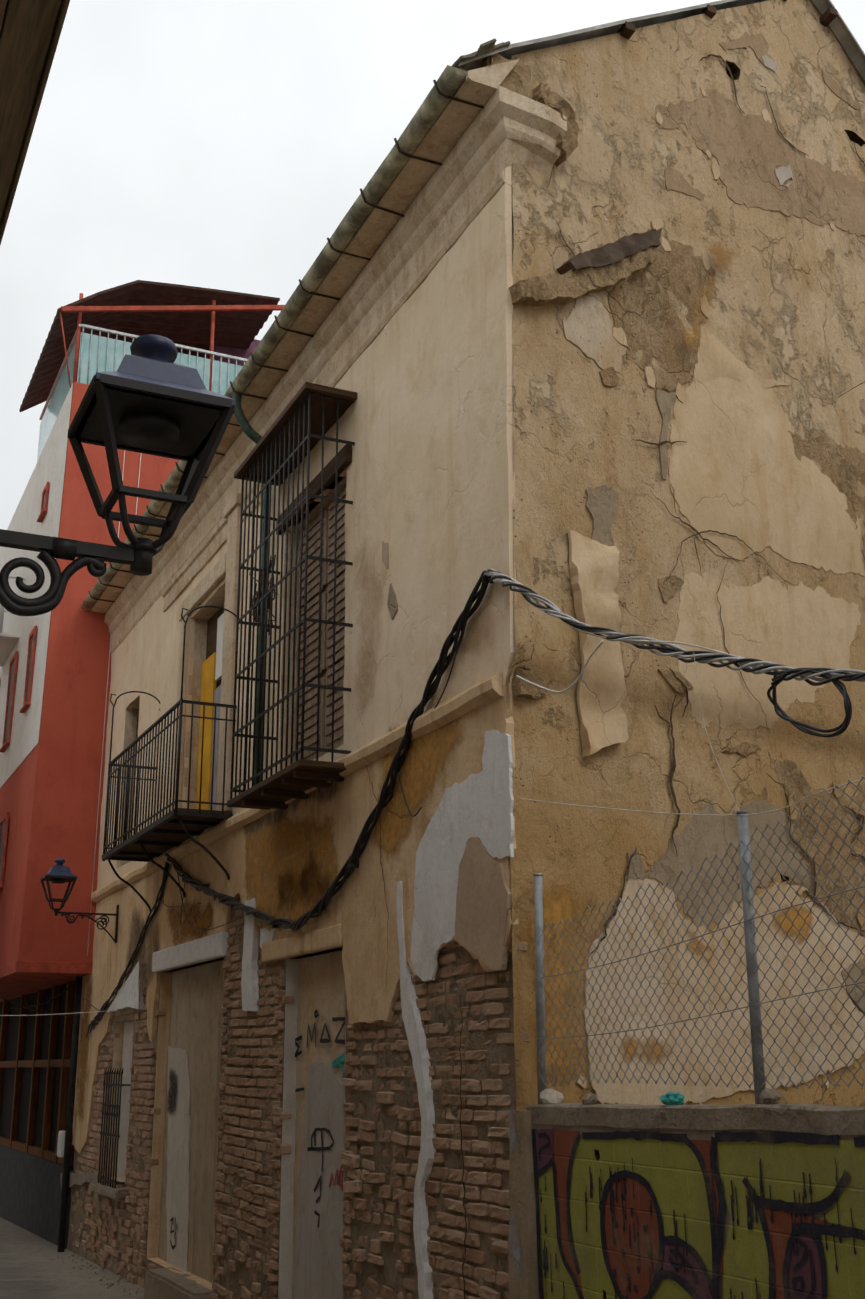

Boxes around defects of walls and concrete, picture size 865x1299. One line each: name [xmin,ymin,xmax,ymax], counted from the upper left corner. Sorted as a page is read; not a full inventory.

flaking render [719,32,777,80]
flaking render [655,88,865,237]
flaking render [562,217,717,480]
crack [632,438,684,446]
crack [649,480,795,731]
flaking render [787,430,865,559]
damp [244,781,337,927]
flaking render [575,741,865,1105]
crack [767,773,865,932]
flaking render [69,967,166,1288]
flaking render [211,900,295,1299]
flaking render [340,837,530,1299]